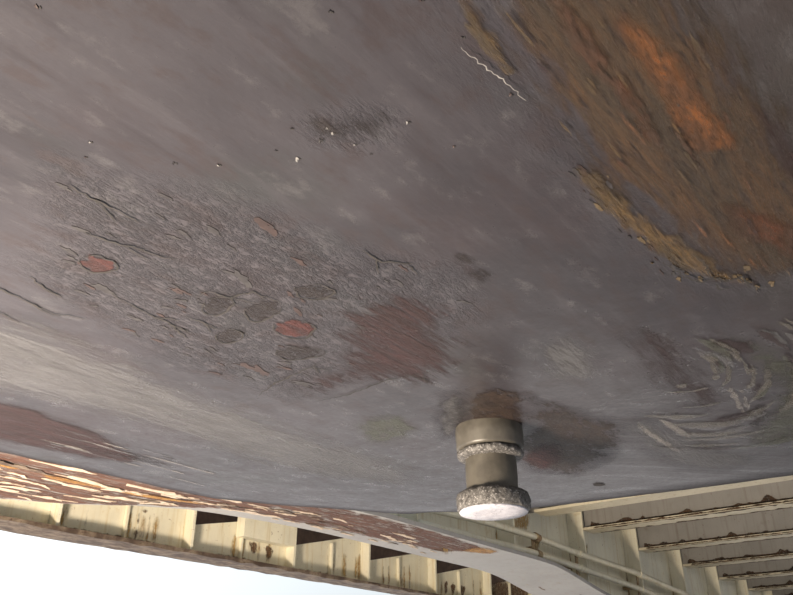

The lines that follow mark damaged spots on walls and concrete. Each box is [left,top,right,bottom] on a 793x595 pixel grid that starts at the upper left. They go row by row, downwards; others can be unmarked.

peeling [203,280,337,389]
damp [315,296,466,388]
damp [0,329,412,485]